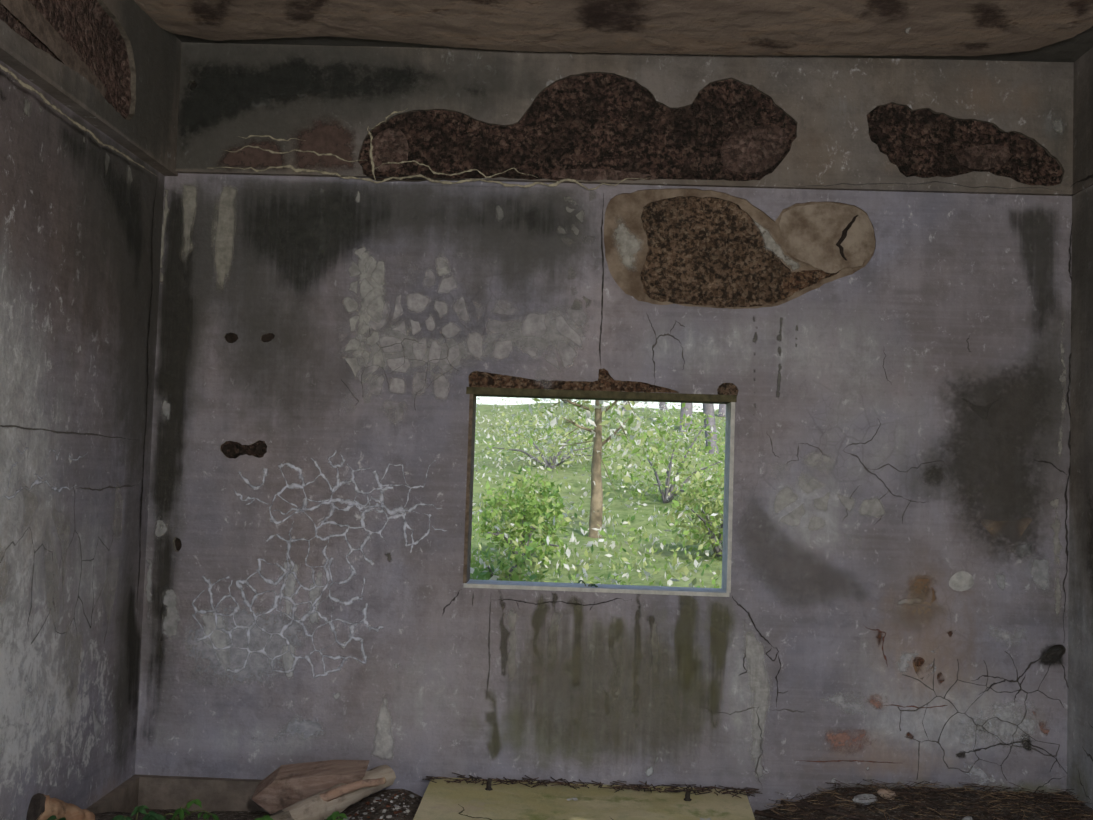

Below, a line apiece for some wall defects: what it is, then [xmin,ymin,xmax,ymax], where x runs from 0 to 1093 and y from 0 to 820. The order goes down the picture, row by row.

spalling [0,0,136,121]
crack [0,184,157,662]
leakage [128,185,447,712]
flaking render [343,248,679,422]
spalling [216,72,876,309]
crack [797,308,1093,799]
spalling [867,102,1065,186]
leakage [927,368,1061,615]
crack [1066,223,1074,280]
leakage [487,694,499,757]
leakage [500,594,729,776]
crack [697,596,800,783]